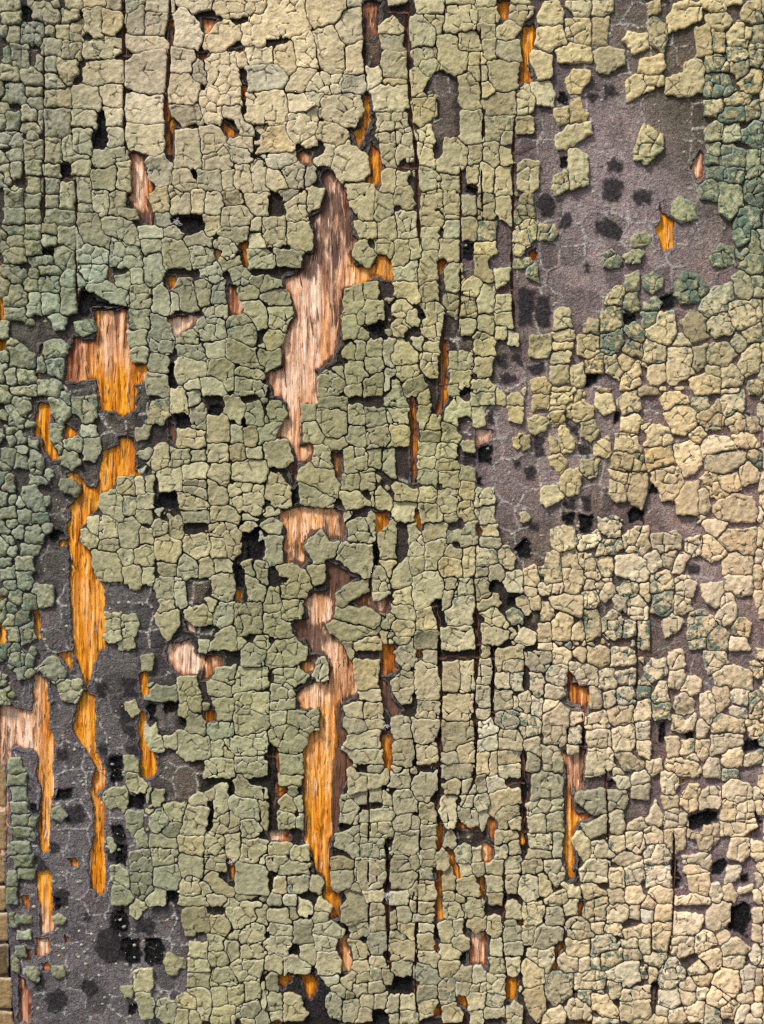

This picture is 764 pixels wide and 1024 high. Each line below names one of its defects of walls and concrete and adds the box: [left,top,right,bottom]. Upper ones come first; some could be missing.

crack [24,25,96,313]
peeling [82,0,172,95]
crack [105,0,193,159]
peeling [347,0,408,86]
peeling [436,4,478,78]
crack [387,2,533,483]
peeling [512,0,764,436]
peeling [484,340,703,595]
crack [348,575,543,1013]
peeling [442,659,475,722]
crack [567,620,658,886]
crack [650,826,692,1014]